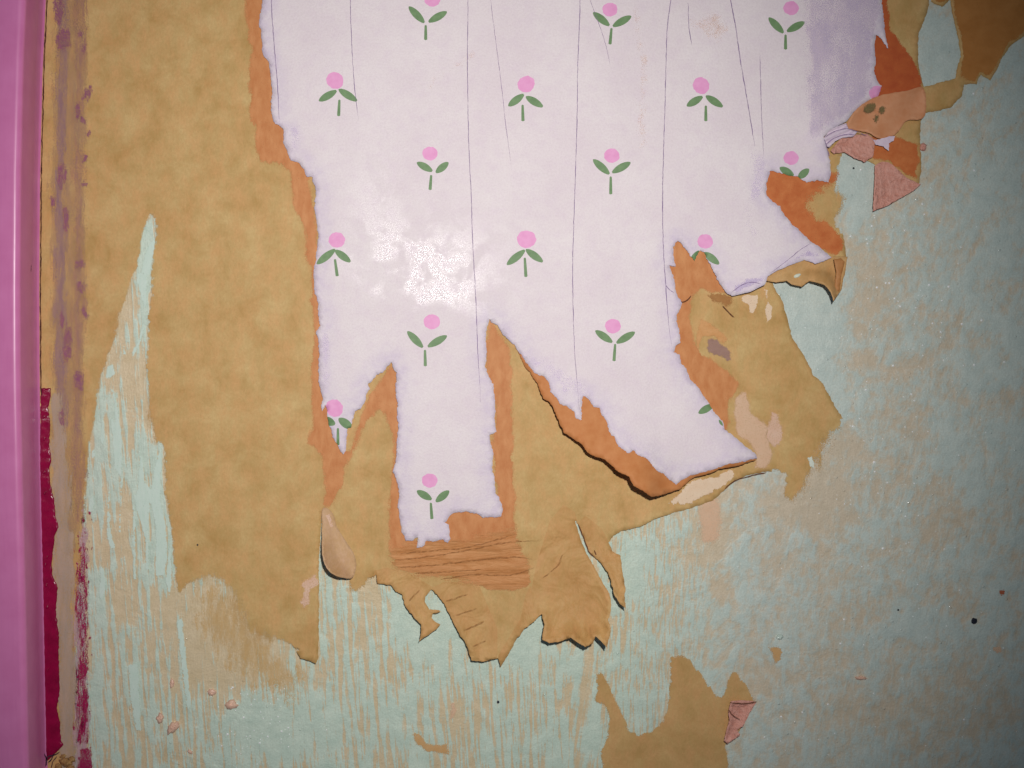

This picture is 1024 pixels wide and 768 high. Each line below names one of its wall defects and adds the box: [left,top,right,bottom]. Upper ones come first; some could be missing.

peeling [742,256,848,321]
flaking render [668,470,734,505]